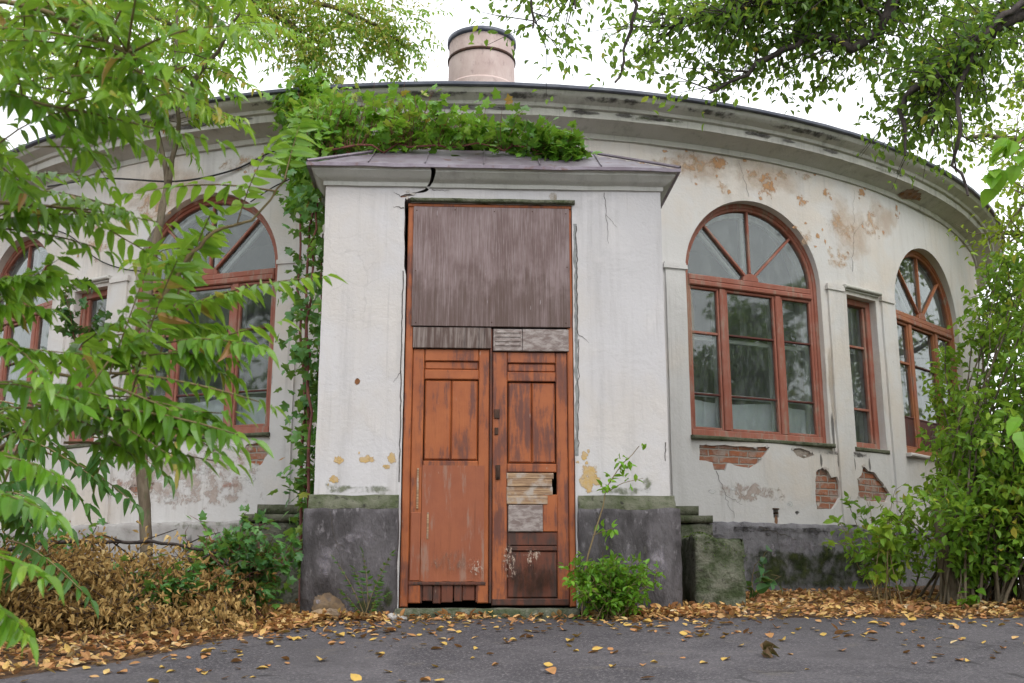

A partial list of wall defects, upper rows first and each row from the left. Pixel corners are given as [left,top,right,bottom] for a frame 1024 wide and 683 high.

crack [396,168,449,208]
peeling [663,150,731,194]
peeling [743,159,782,200]
peeling [793,212,884,266]
peeling [114,441,268,504]
peeling [327,456,343,486]
peeling [358,452,396,469]
peeling [576,449,603,493]
spalling [699,445,768,470]
spalling [791,447,813,458]
spalling [815,467,838,509]
spalling [857,465,887,502]